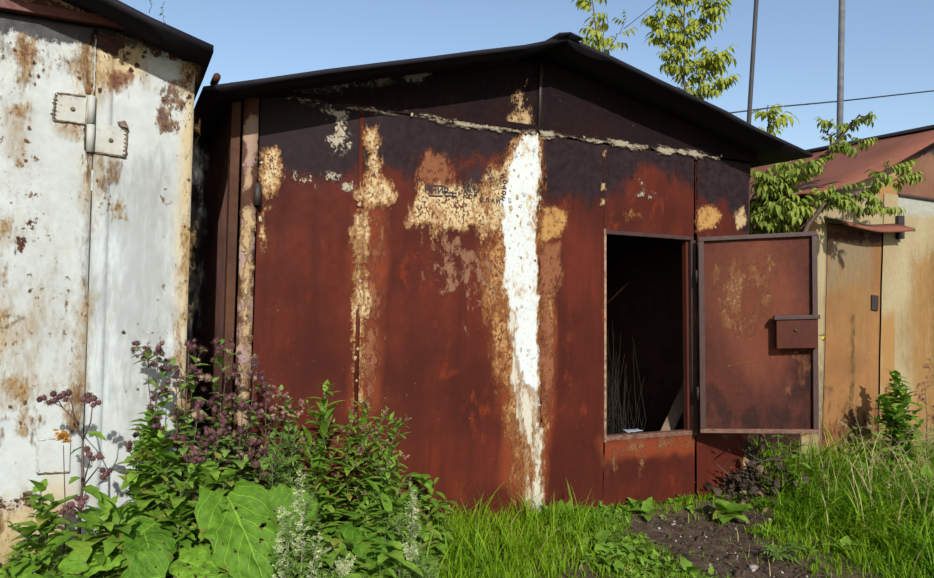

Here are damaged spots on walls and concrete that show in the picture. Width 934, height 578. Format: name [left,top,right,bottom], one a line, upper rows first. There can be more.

rust [1,213,44,254]
rust [1,33,48,95]
rust [84,152,127,220]
rust [54,34,198,134]
rust [237,206,256,402]
peeling [259,125,398,406]
peeling [285,96,394,156]
rust [414,148,461,191]
rust [433,230,503,332]
rust [536,206,568,460]
peeling [403,80,722,517]
rust [0,490,37,562]